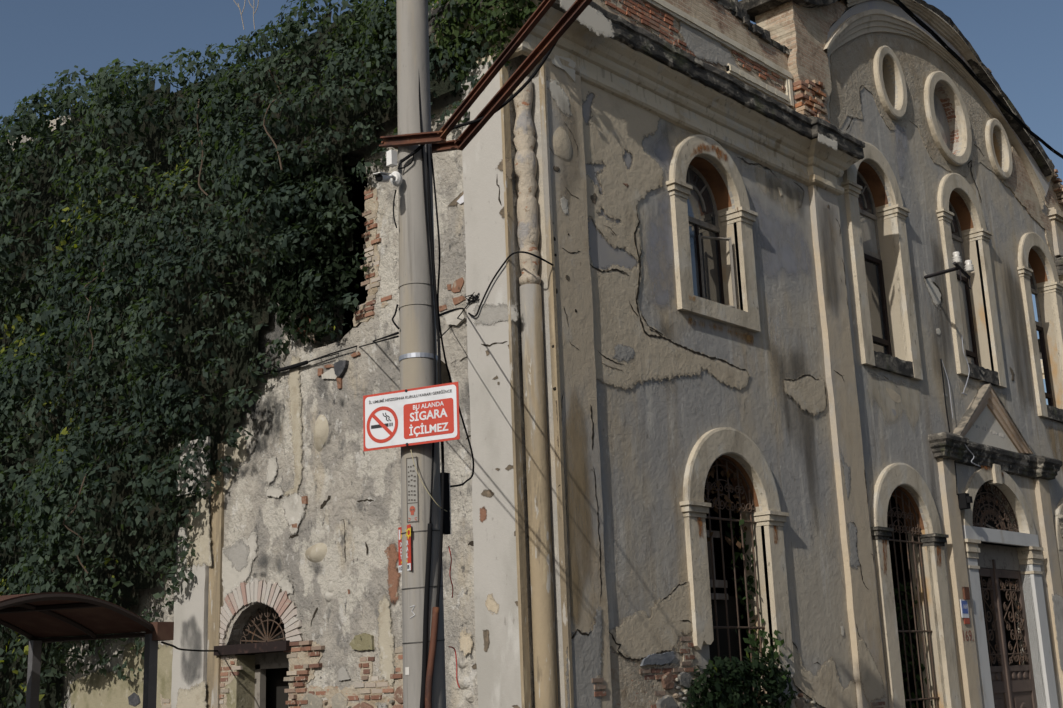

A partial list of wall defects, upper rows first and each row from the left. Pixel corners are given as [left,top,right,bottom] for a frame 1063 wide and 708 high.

flaking render [731,50,786,91]
peeling [542,55,750,390]
crack [563,206,749,381]
flaking render [318,364,343,389]
spalling [384,543,400,605]
spalling [592,581,695,708]